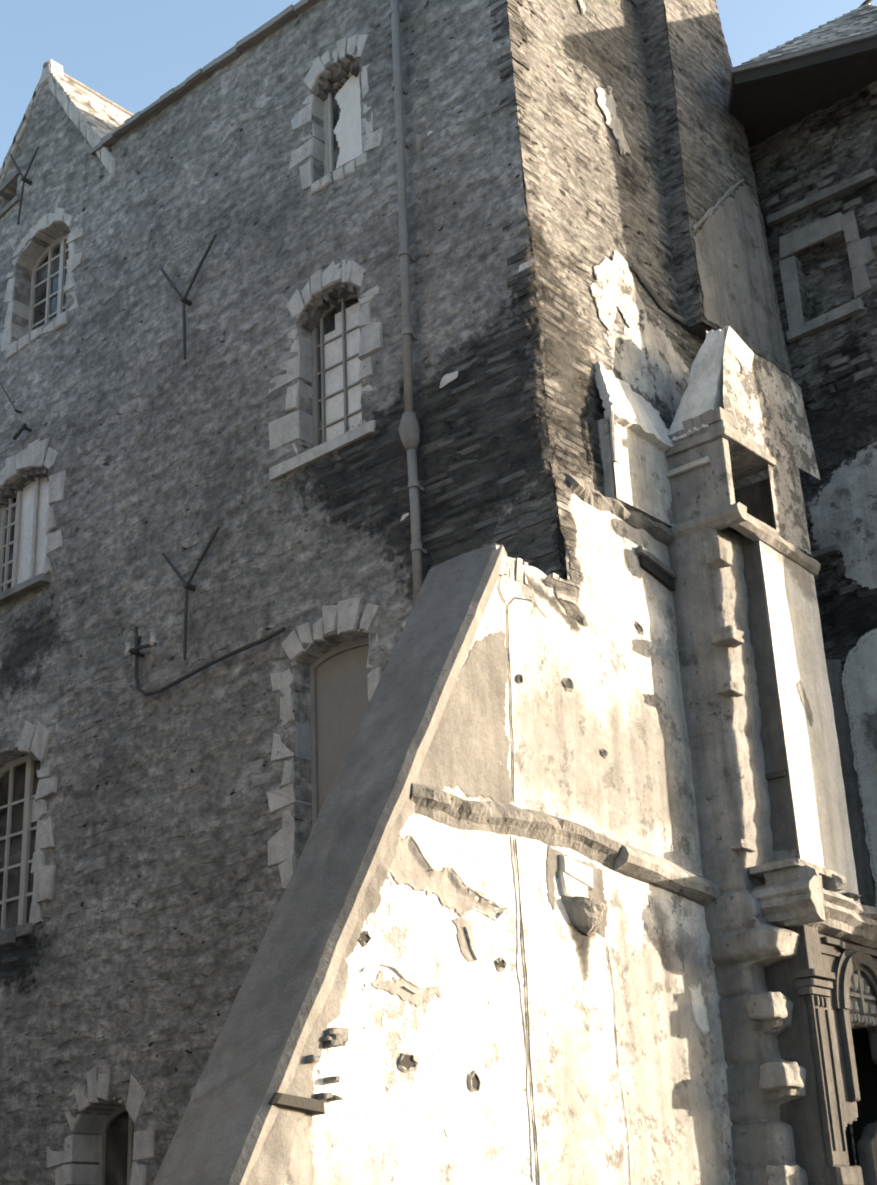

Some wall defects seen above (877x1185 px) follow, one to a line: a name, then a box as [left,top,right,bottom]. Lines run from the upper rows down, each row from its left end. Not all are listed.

flaking render [487,468,588,627]
damp [415,631,513,803]
crack [498,577,547,803]
flaking render [246,796,507,1185]
crack [511,835,540,1185]
damp [579,937,590,981]
crack [606,939,631,1185]
damp [688,983,711,1035]